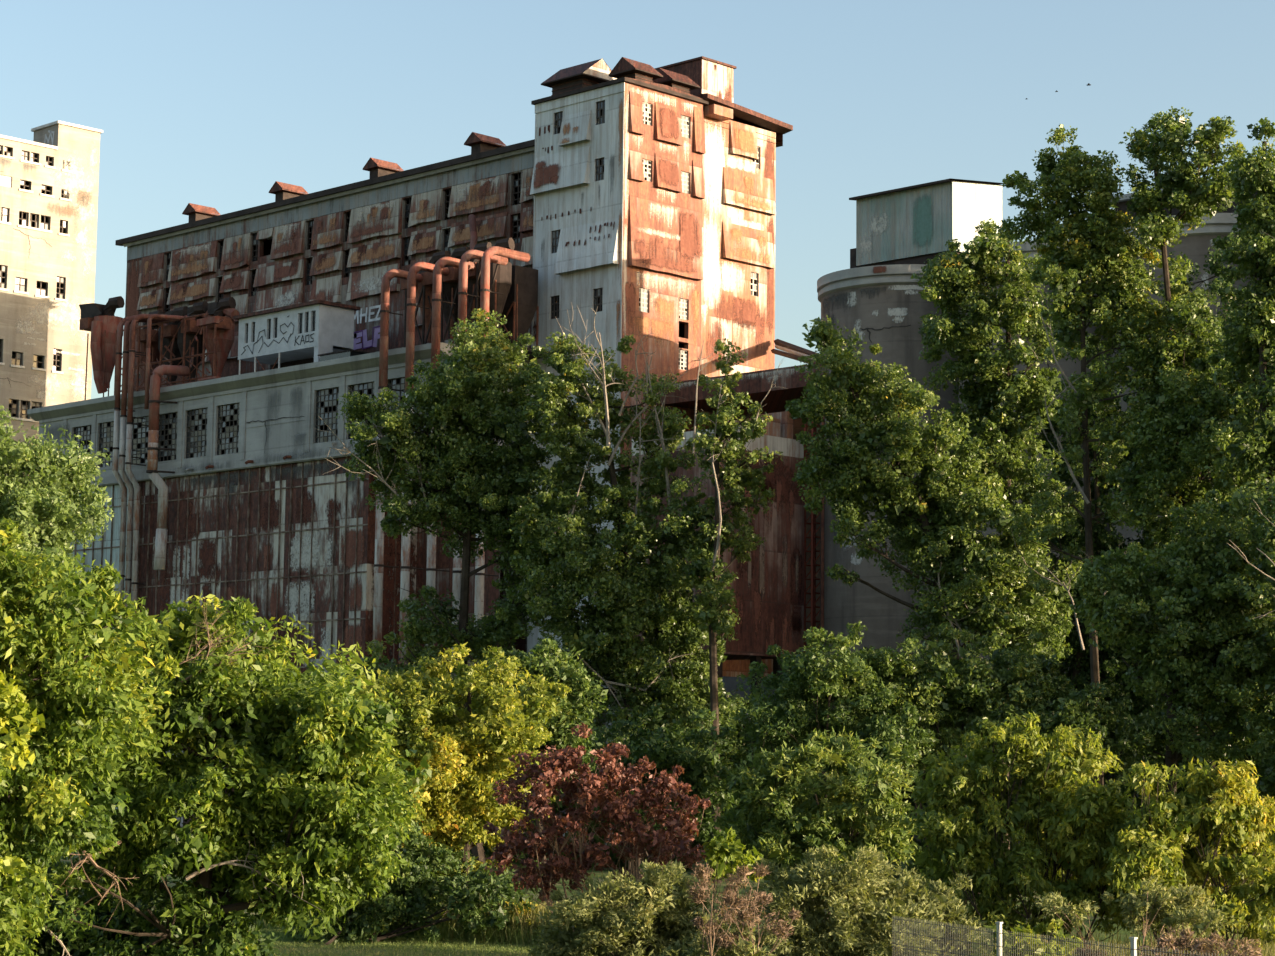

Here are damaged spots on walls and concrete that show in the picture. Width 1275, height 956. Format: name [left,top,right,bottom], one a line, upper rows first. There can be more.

rust [660,108,679,140]
rust [523,123,591,228]
rust [659,159,679,185]
rust [314,206,394,271]
rust [411,199,435,251]
rust [453,181,499,242]
rust [565,212,701,273]
rust [692,129,775,364]
rust [616,283,674,341]
rust [159,501,171,624]
rust [184,502,220,613]
rust [251,490,417,676]